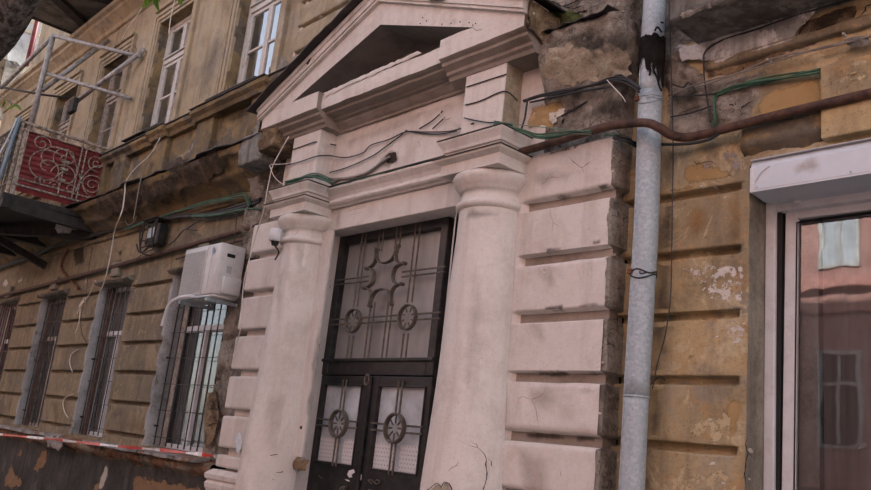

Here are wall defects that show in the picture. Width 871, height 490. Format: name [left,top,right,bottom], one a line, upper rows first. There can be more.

flaking render [542,33,632,87]
flaking render [664,6,857,133]
peeling [528,102,565,128]
peeling [683,261,743,302]
peeling [690,401,742,442]
peeling [4,466,22,489]
peeling [34,450,47,472]
peeling [133,475,201,490]